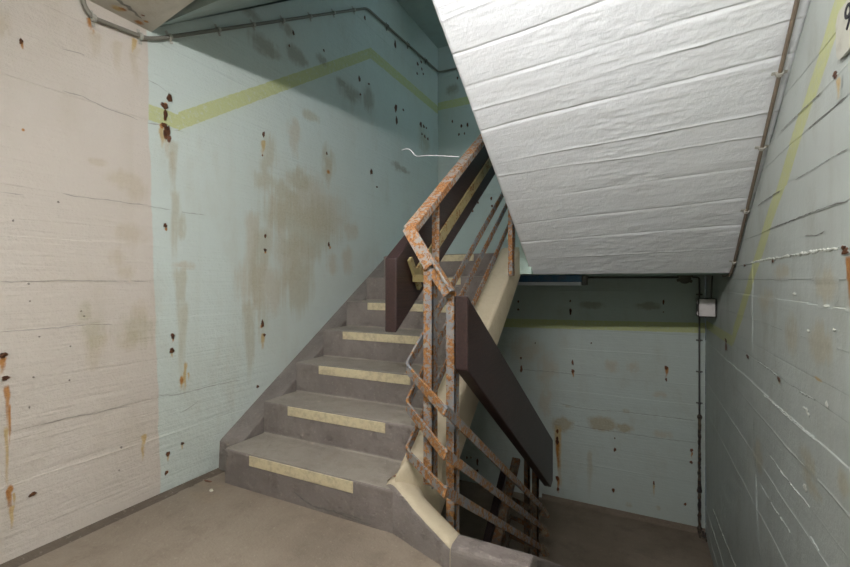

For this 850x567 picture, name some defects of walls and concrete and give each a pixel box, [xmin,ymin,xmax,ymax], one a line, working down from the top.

corrosion [832,69,842,103]
corrosion [158,91,181,191]
crack [62,193,204,215]
leakage [166,188,197,402]
leakage [231,105,360,386]
leakage [505,332,641,435]
corrosion [0,351,17,531]